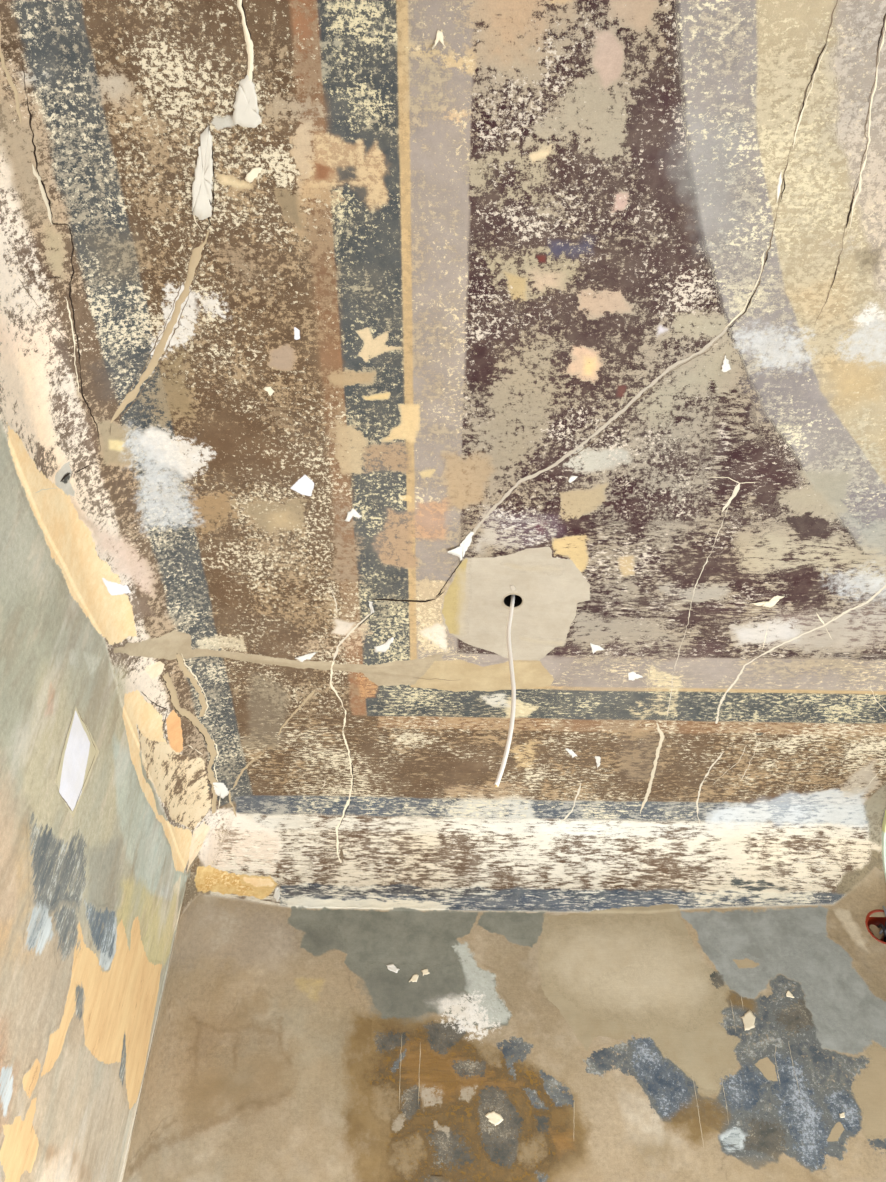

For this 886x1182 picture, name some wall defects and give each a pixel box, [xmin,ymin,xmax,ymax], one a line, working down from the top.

crack [0,0,262,473]
crack [813,14,886,331]
flaking render [3,417,141,650]
crack [143,0,838,863]
spalling [504,595,522,607]
crack [715,585,886,724]
peeling [0,912,163,1182]
water stain [284,903,605,1182]
peeling [581,969,886,1175]